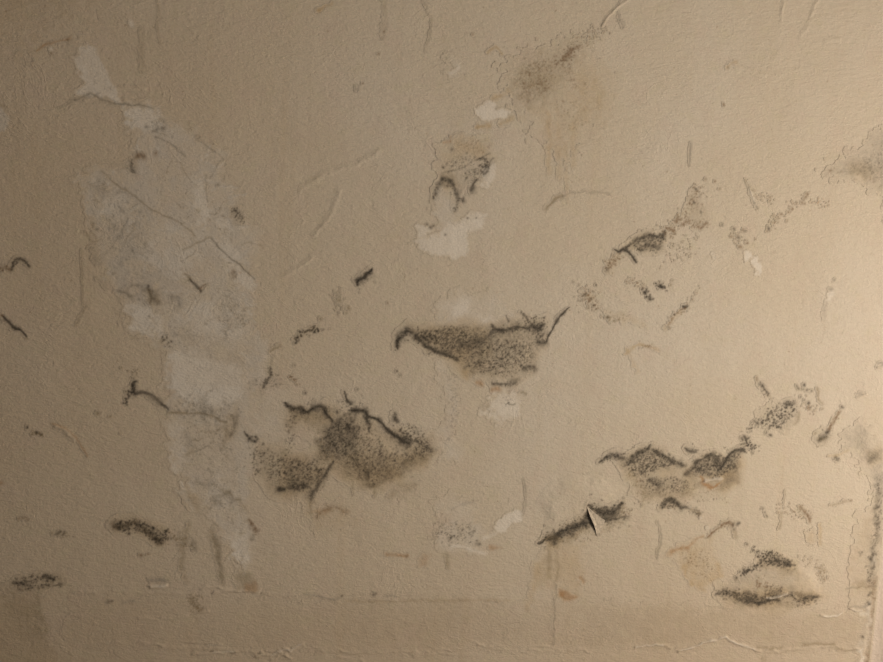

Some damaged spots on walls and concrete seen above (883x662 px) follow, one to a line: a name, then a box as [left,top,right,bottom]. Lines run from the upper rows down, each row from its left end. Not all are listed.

peeling [474,100,512,123]
water stain [429,21,619,214]
water stain [815,124,883,202]
peeling [68,42,295,577]
water stain [351,265,377,294]
peeling [408,191,491,261]
water stain [391,280,648,393]
water stain [662,285,702,332]
water stain [602,177,830,303]
water stain [120,316,442,538]
peeling [477,388,528,428]
water stain [0,375,883,662]